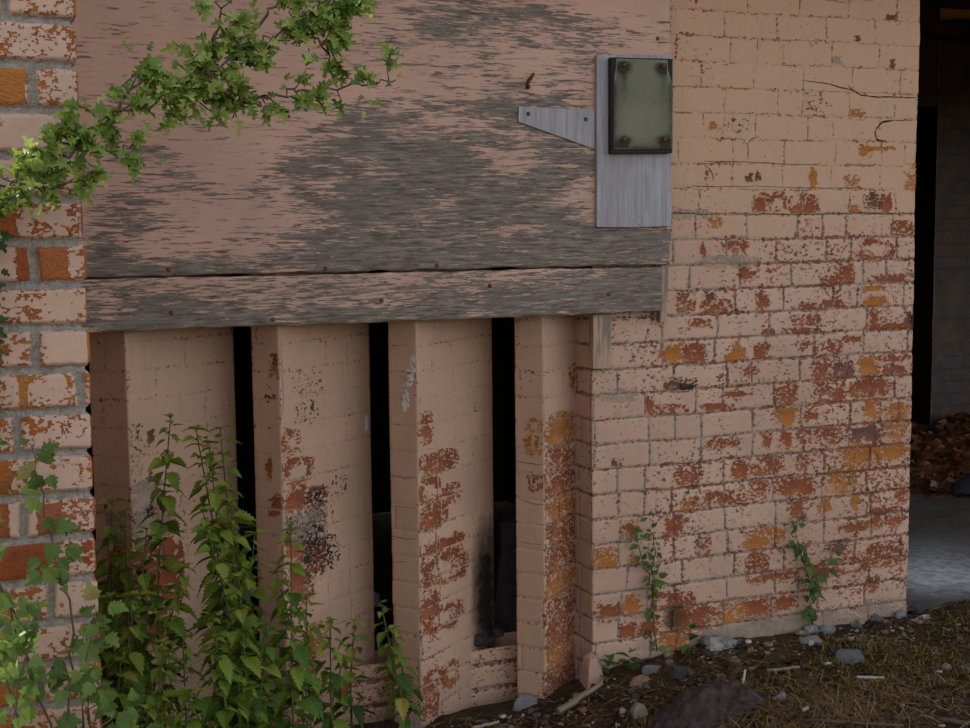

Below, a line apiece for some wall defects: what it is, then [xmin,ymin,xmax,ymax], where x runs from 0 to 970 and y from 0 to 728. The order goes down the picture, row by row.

peeling [709,117,749,133]
crack [802,80,915,142]
peeling [903,163,917,193]
spalling [0,0,189,728]
peeling [268,353,279,380]
water stain [402,355,416,412]
flaking render [592,167,915,658]
flaking render [264,369,348,611]
flaking render [418,410,474,638]
flaking render [523,410,576,697]
flaking render [422,658,459,722]